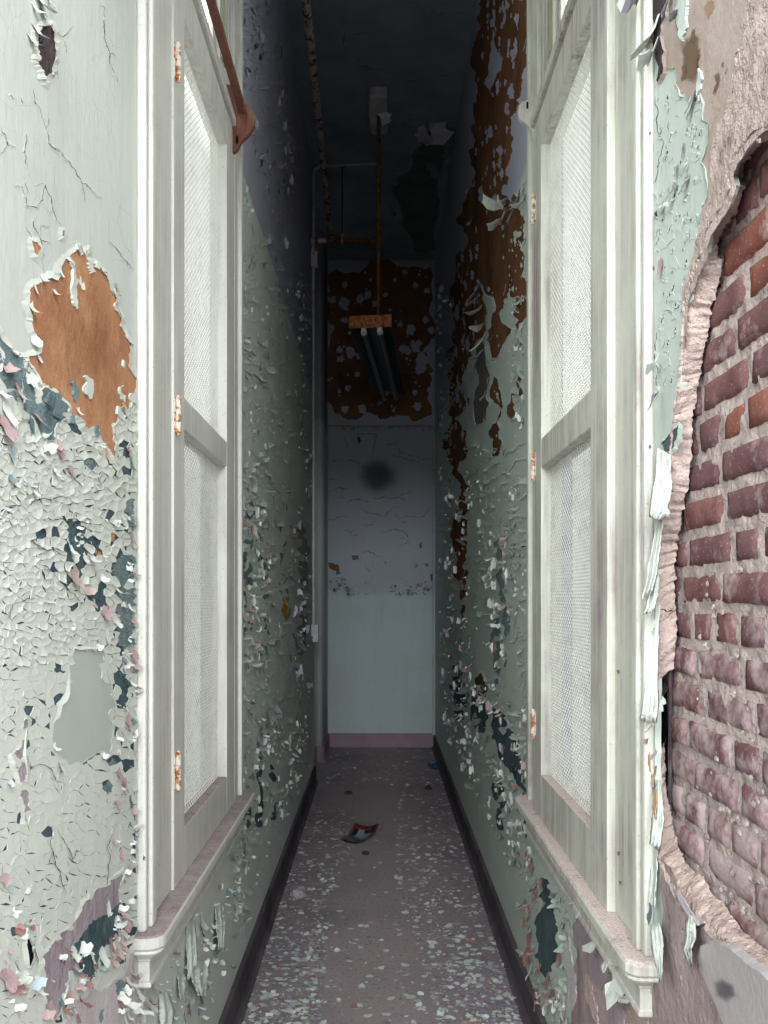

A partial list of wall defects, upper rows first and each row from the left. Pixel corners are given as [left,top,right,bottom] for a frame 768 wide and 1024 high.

peeling [27,0,62,90]
crack [0,25,104,258]
peeling [0,226,138,483]
crack [99,3,120,86]
crack [107,239,134,272]
peeling [35,158,314,1024]
flaking render [328,0,768,1024]